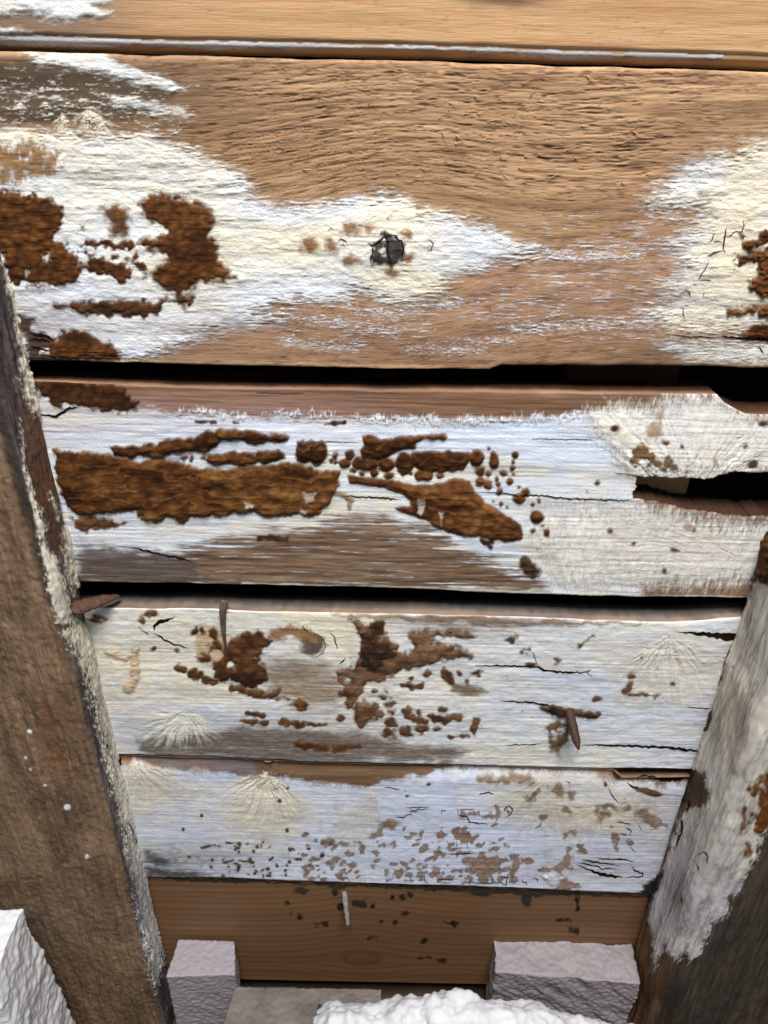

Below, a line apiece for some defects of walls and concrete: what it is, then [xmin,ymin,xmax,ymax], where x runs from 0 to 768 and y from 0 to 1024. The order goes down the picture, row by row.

leakage [0,52,191,124]
leakage [0,127,545,401]
leakage [570,139,768,367]
peeling [299,493,316,515]
peeling [334,491,354,510]
leakage [19,371,768,995]
crack [501,699,561,707]
crack [476,653,590,675]
crack [592,706,712,752]
crack [677,631,736,685]
peeling [301,805,587,891]
peeling [609,826,634,851]